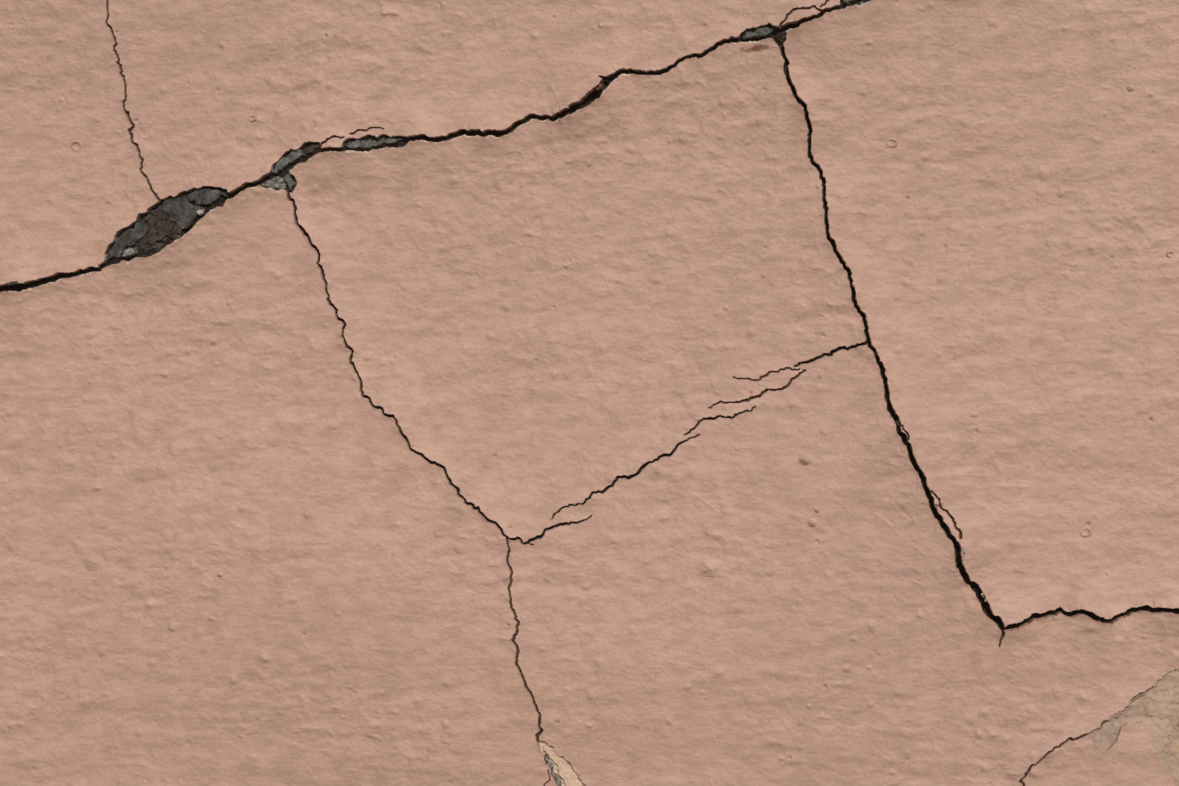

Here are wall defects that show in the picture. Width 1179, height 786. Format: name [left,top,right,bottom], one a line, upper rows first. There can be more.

crack [106,0,162,203]
crack [0,240,174,292]
spalling [107,187,233,262]
crack [180,0,1179,742]
spalling [539,741,586,786]
crack [1019,669,1179,786]
peeling [1087,669,1179,785]